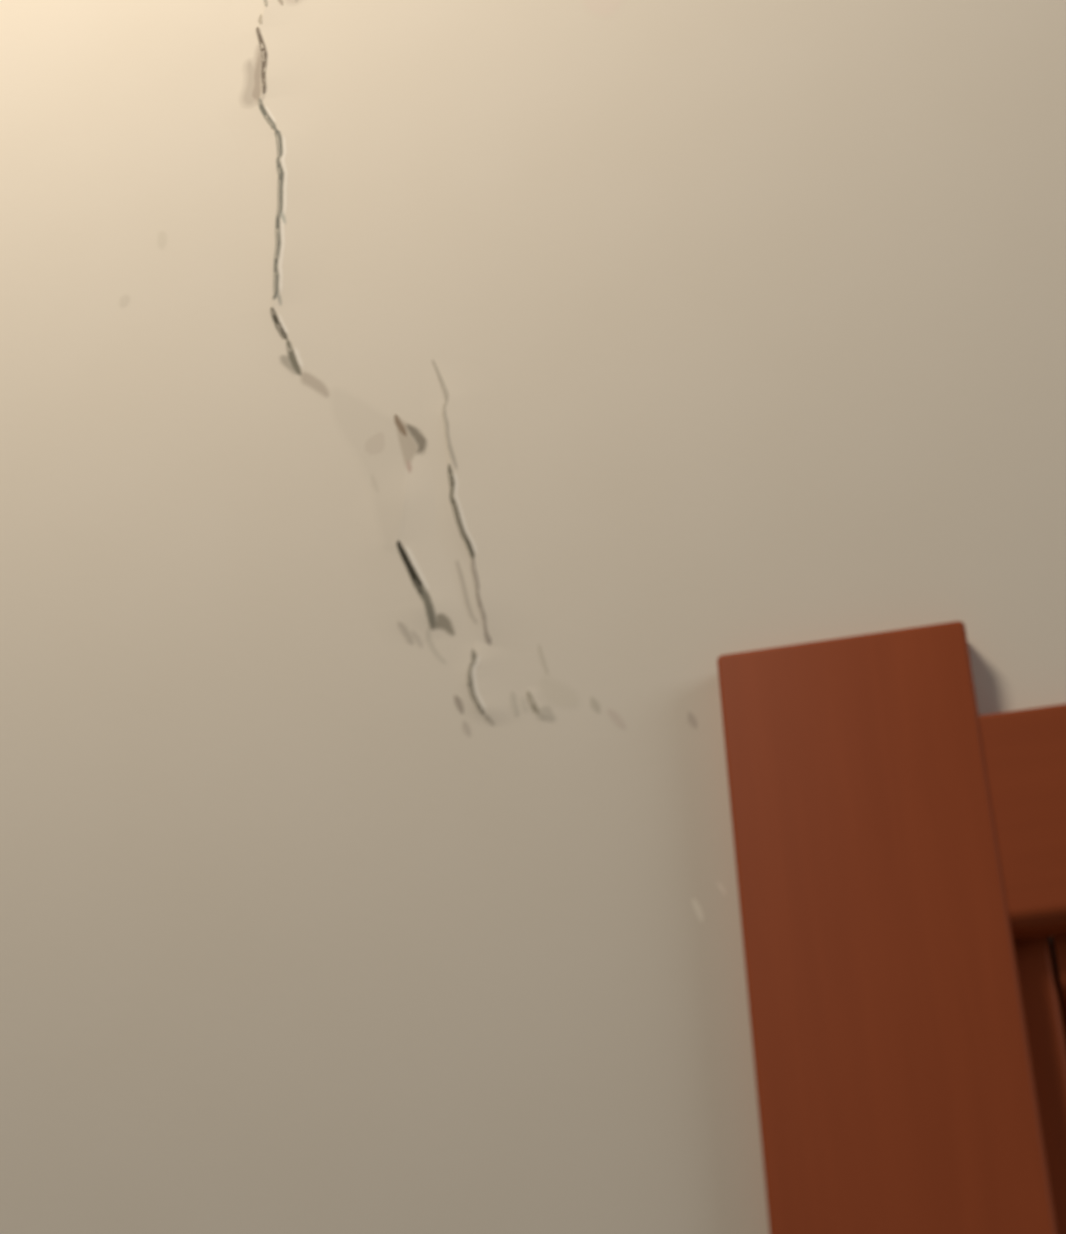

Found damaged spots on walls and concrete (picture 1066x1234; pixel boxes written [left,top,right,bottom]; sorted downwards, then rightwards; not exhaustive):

crack [255,0,303,376]
spalling [428,612,456,636]
crack [394,359,495,726]